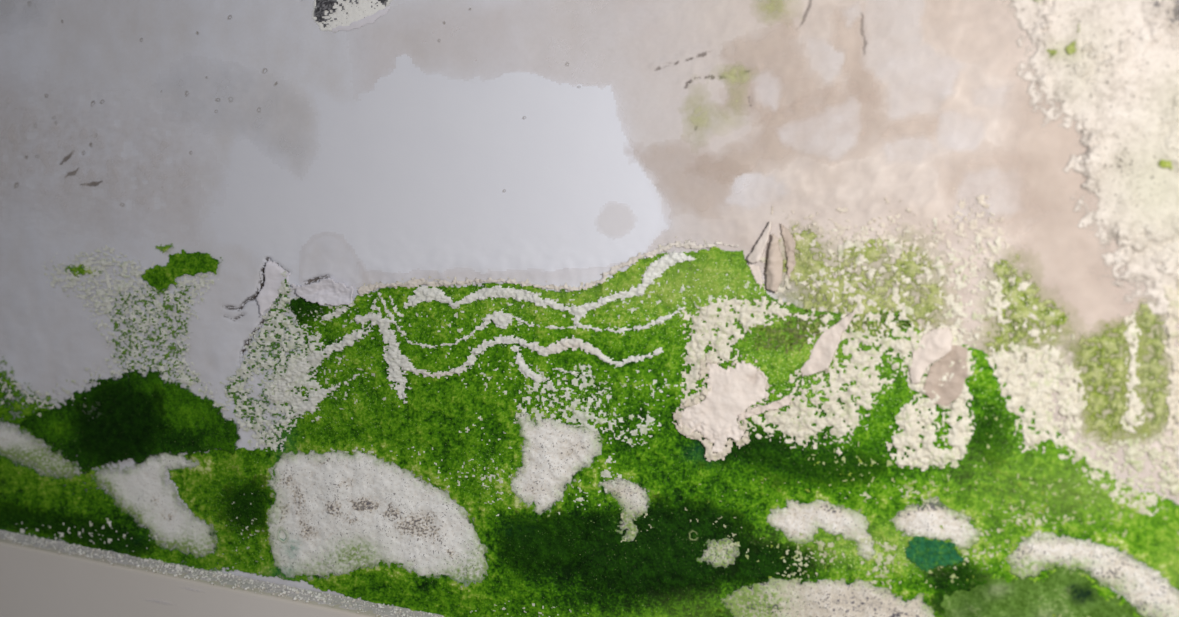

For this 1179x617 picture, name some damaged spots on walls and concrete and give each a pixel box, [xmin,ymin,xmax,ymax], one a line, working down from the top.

spalling [312,0,392,32]
damp [0,0,1158,452]
peeling [256,259,354,317]
spalling [672,0,1179,617]
damp [1048,313,1179,502]
damp [20,518,168,552]
damp [390,413,512,516]
damp [554,453,633,514]